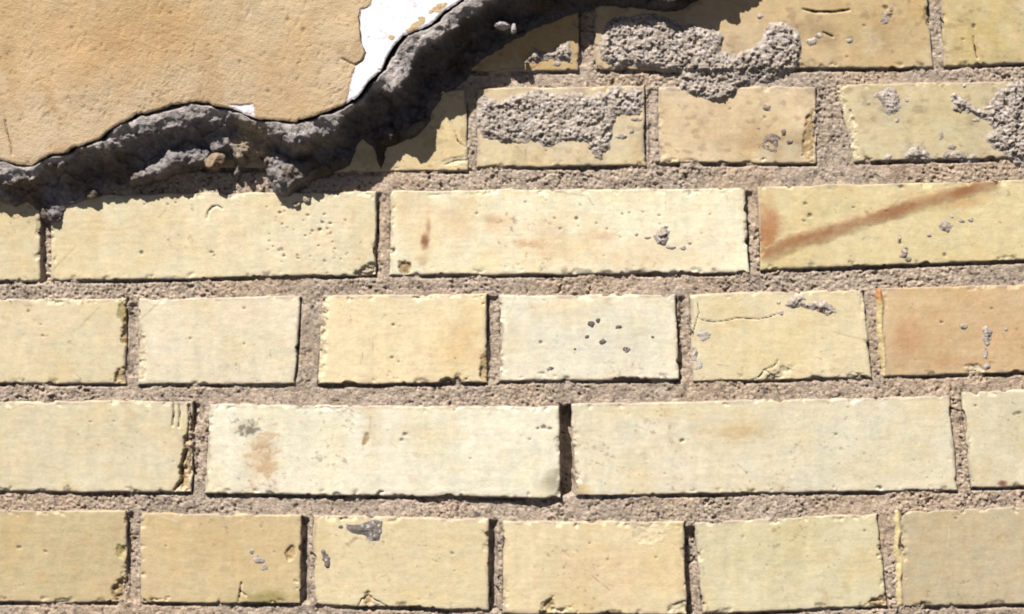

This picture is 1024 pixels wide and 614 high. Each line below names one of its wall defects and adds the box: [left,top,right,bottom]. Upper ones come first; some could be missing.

flaking render [0,0,698,225]
peeling [939,132,980,163]
peeling [950,84,989,123]
corrosion [760,181,1008,266]